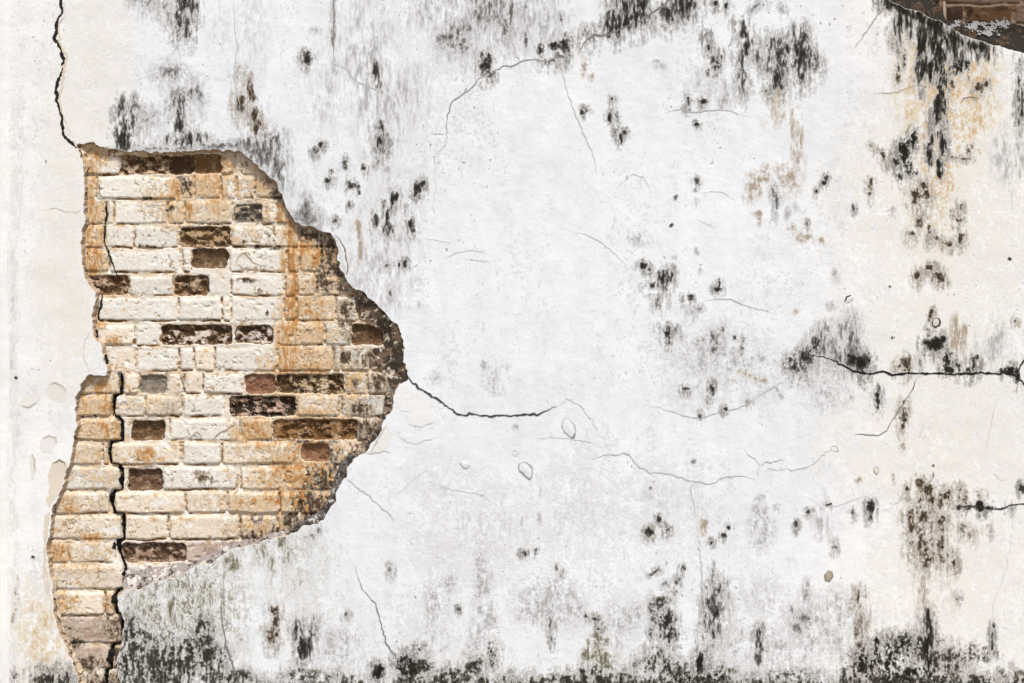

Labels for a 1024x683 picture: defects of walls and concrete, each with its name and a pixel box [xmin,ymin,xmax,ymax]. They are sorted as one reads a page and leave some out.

crack [52,0,77,148]
crack [432,0,672,209]
spalling [890,0,1024,53]
damp [23,0,836,423]
crack [83,179,127,683]
spalling [20,142,436,683]
crack [407,375,831,656]
crack [646,354,1024,481]
crack [824,492,1024,634]